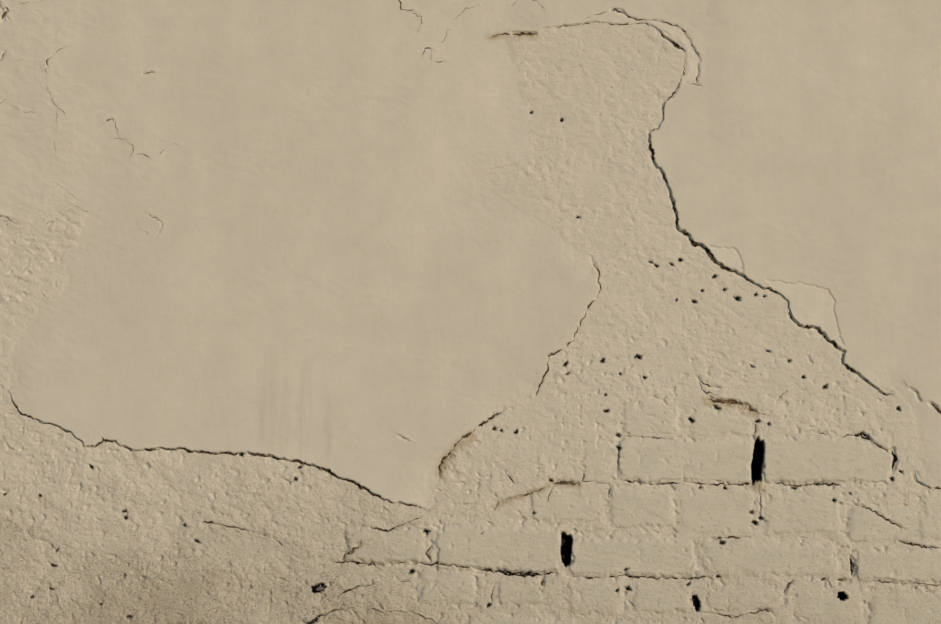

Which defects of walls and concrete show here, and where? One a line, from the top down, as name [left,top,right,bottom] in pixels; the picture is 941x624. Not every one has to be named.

crack [399,0,473,63]
crack [492,30,535,38]
crack [587,8,701,86]
spalling [530,488,603,524]
spalling [679,491,753,534]
spalling [765,489,841,534]
spalling [436,525,562,574]
spalling [570,538,696,577]
spalling [703,540,839,576]
spalling [856,549,941,583]
spalling [633,582,691,613]
spalling [798,589,864,624]